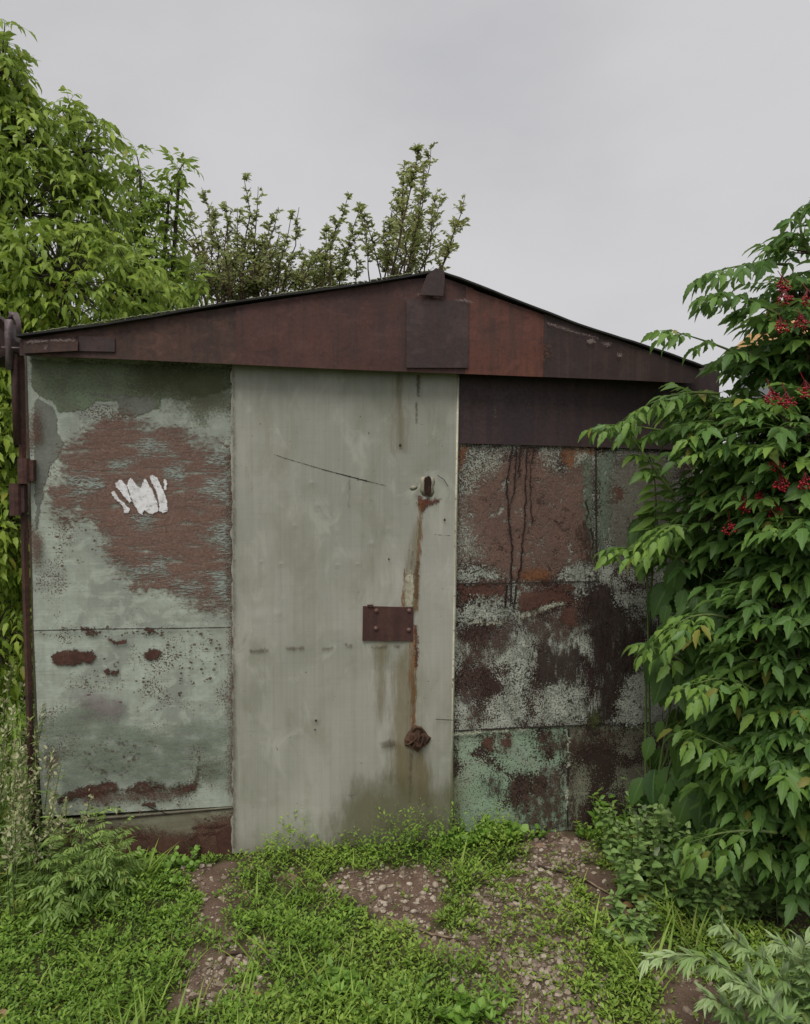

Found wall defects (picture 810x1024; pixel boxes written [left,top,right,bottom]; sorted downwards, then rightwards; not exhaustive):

corrosion [26,520,44,568]
peeling [30,346,232,621]
corrosion [413,496,442,609]
water stain [505,446,535,609]
corrosion [452,517,621,834]
corrosion [47,812,233,857]